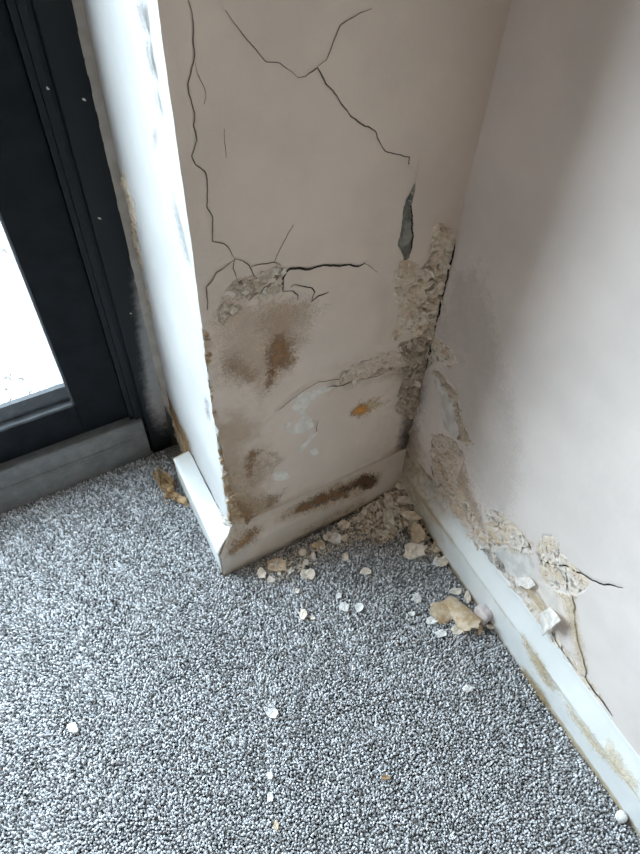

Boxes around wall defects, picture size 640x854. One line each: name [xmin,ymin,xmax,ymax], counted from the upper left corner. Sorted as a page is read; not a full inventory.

spalling [216,261,287,326]
crack [187,0,377,309]
crack [225,9,410,164]
crack [407,205,415,255]
damp [225,485,276,525]
rust [353,399,381,416]
spalling [257,184,604,702]
crack [540,560,622,714]